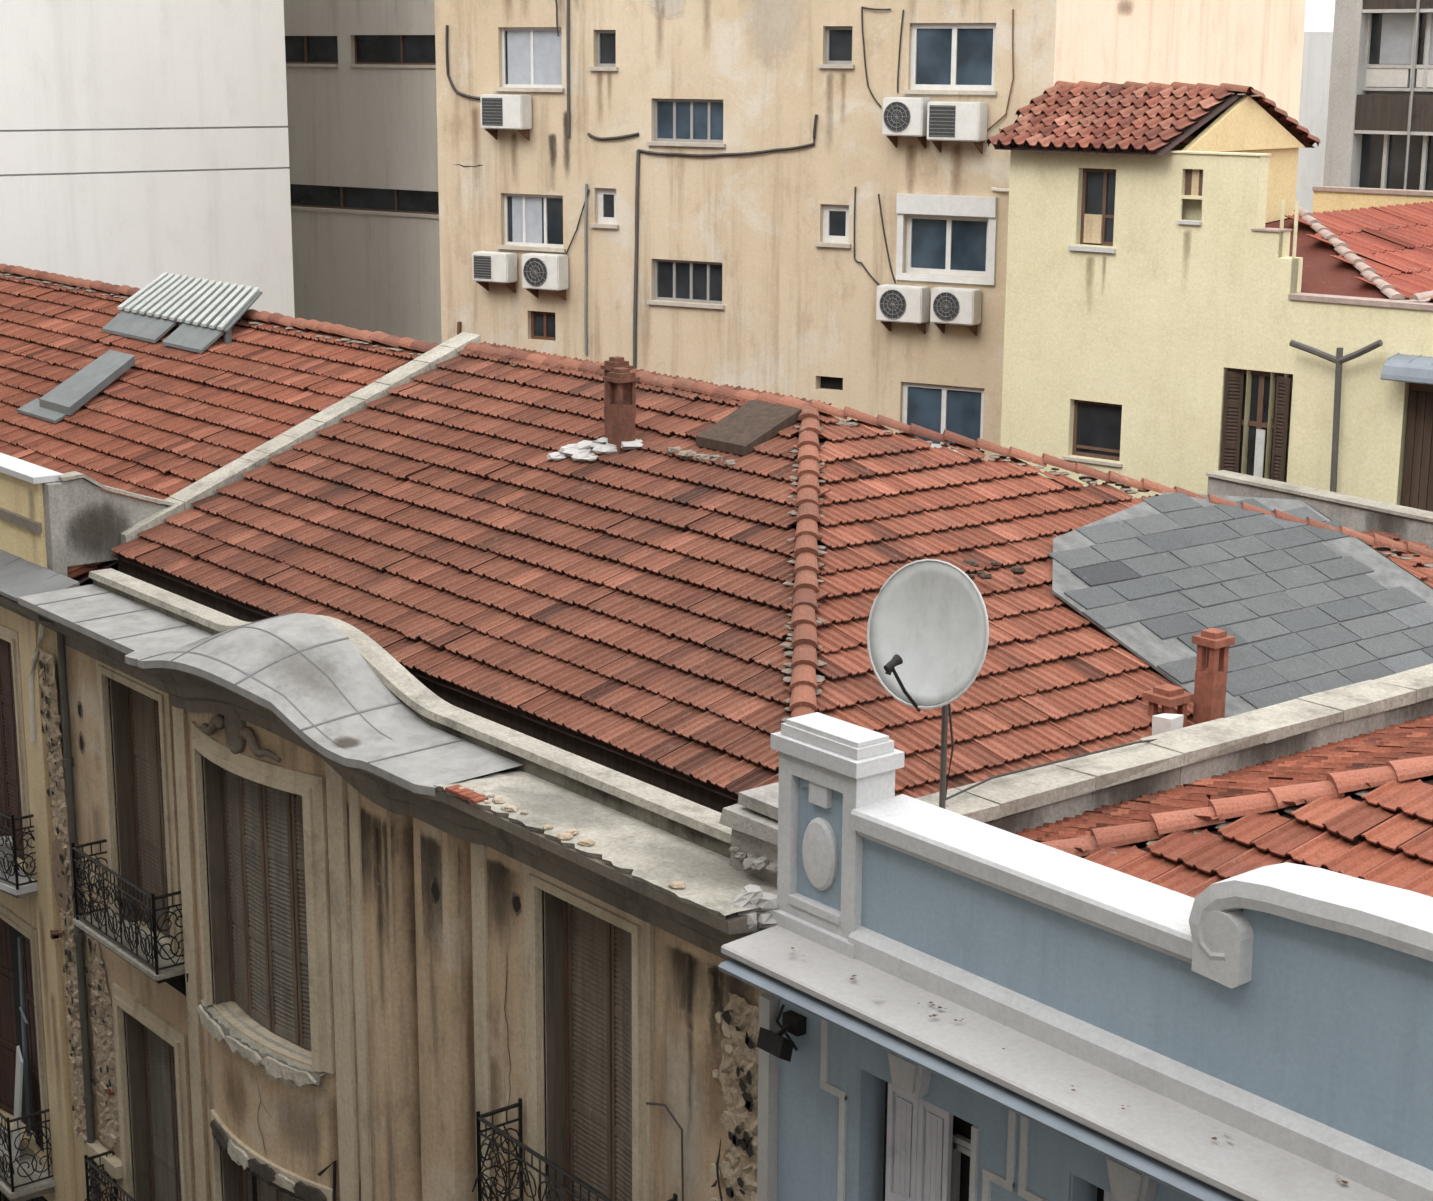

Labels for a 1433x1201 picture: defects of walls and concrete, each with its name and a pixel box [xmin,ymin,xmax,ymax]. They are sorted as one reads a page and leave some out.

spalling [459,787,528,815]
spalling [543,824,596,847]
spalling [38,648,87,1144]
spalling [512,892,521,916]
peeling [715,1011,732,1054]
peeling [711,1161,733,1179]